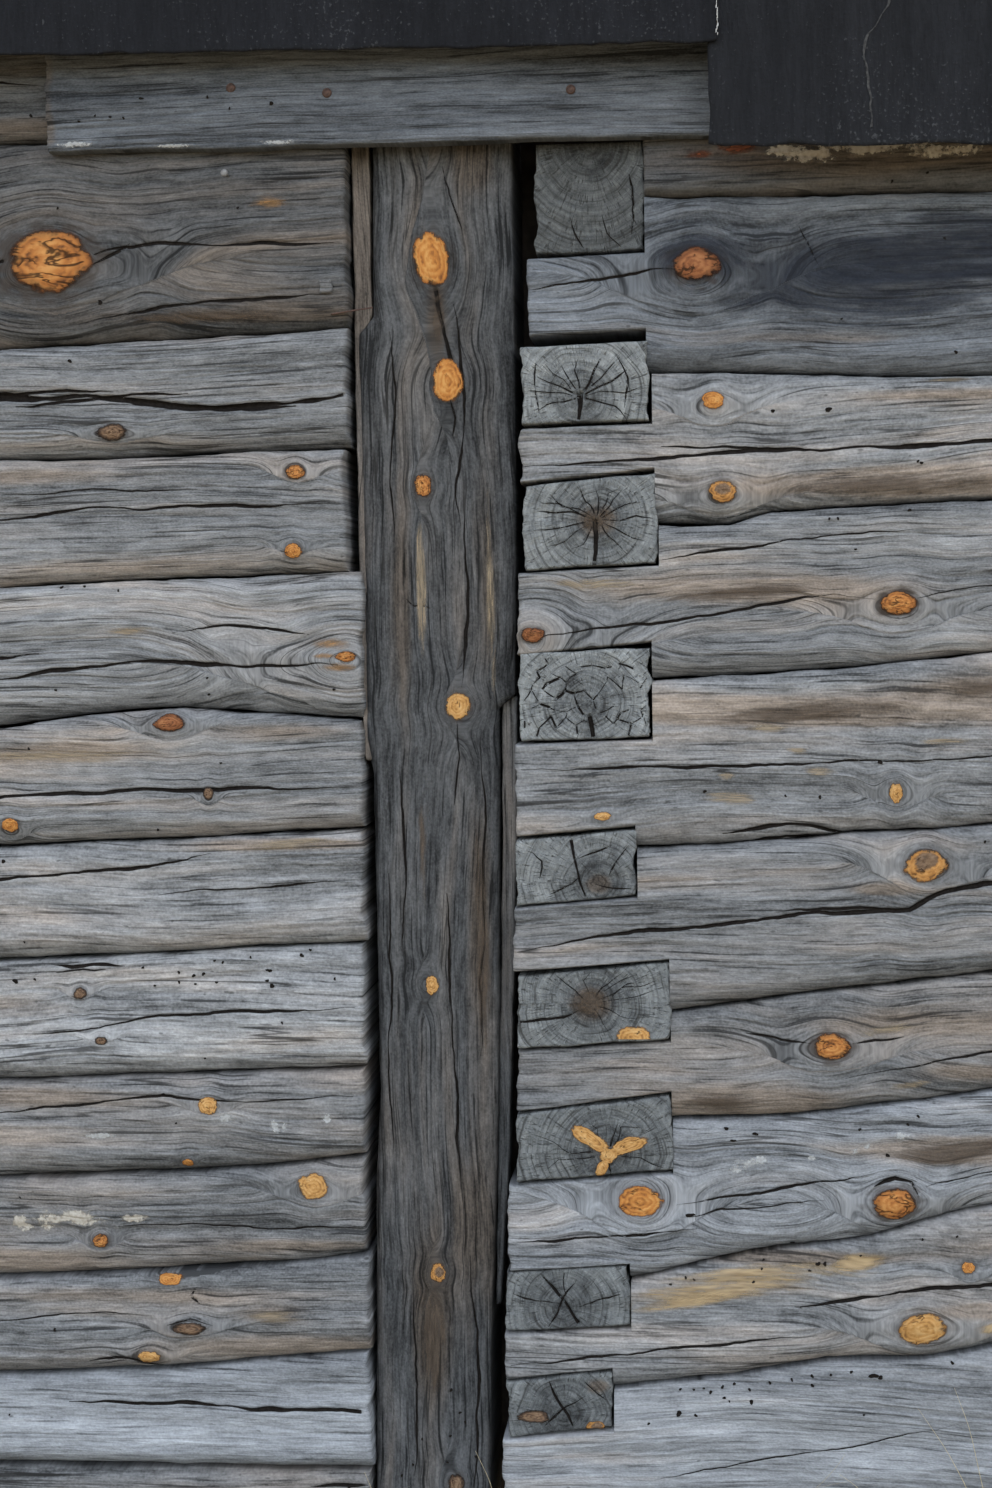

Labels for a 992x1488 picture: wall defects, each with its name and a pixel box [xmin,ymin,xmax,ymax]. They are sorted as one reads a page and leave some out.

crack [92,241,334,265]
crack [108,294,326,318]
crack [0,389,343,412]
crack [532,357,640,420]
crack [524,594,992,771]
crack [722,822,844,841]
crack [532,840,631,896]
crack [446,725,487,1176]
crack [520,881,992,1031]
crack [747,1033,811,1044]
crack [849,1037,992,1078]
crack [470,1171,992,1487]